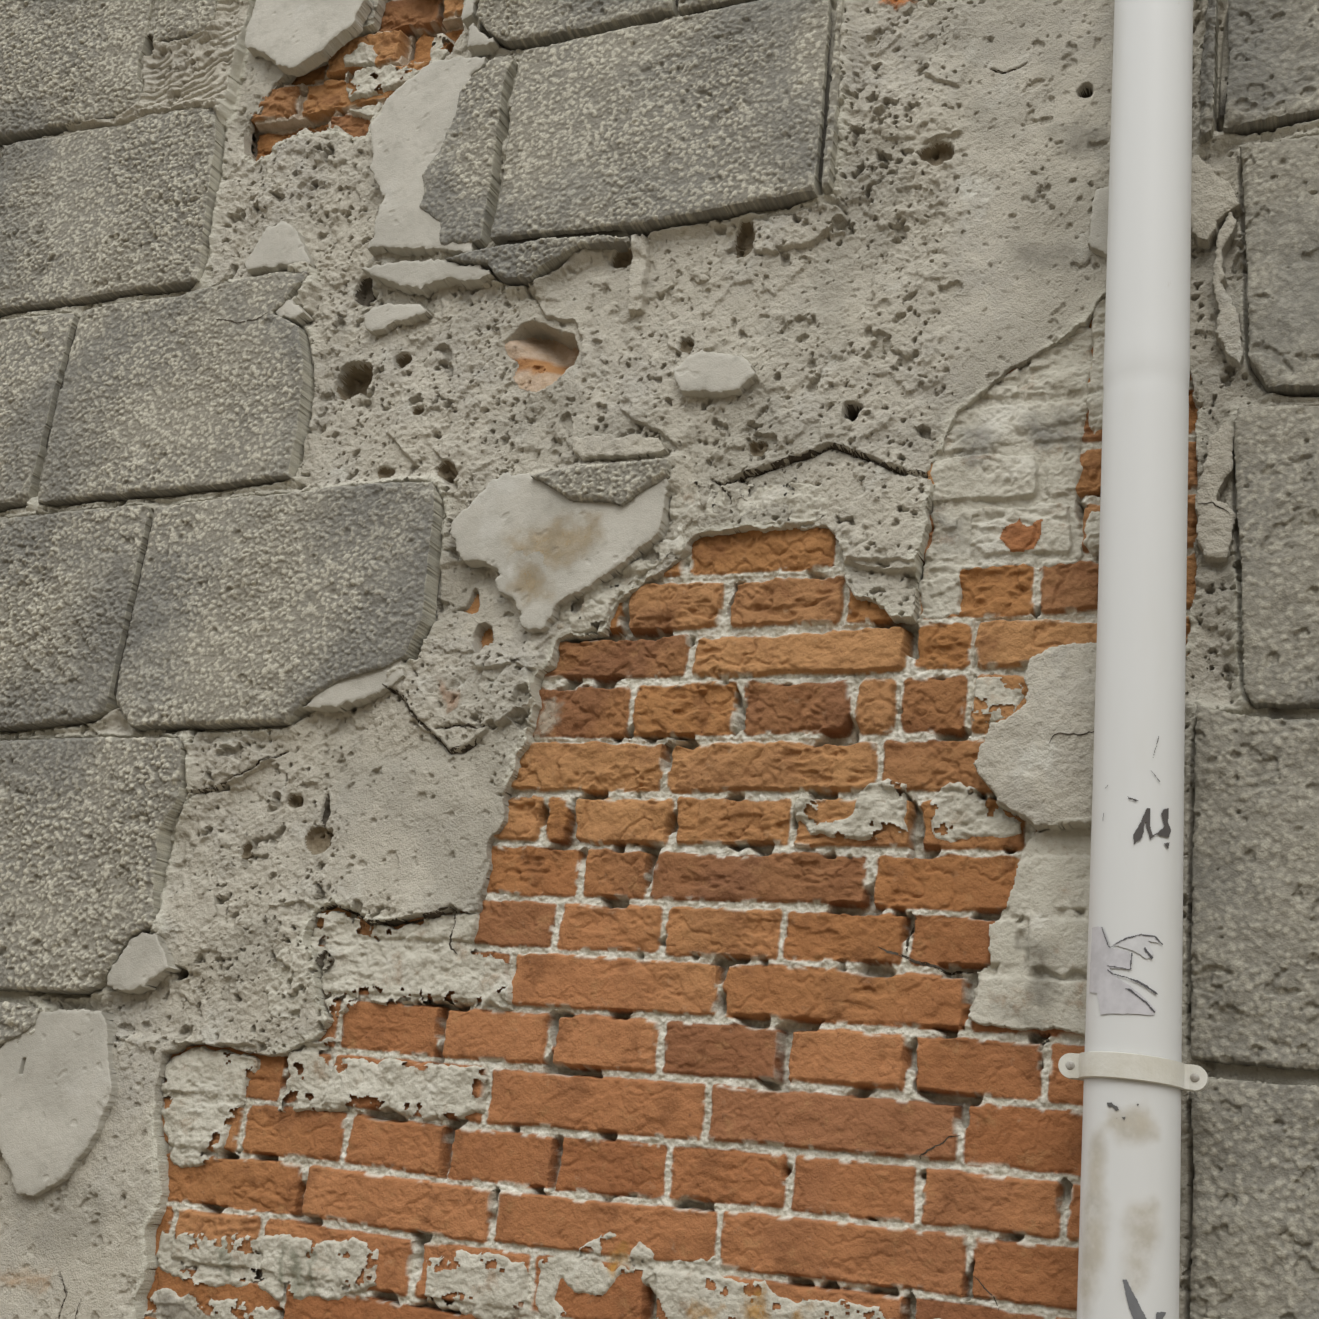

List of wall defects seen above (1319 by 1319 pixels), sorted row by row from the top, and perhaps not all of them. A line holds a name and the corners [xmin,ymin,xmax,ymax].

peeling [245,0,529,257]
crack [712,443,930,499]
peeling [450,472,672,634]
spalling [1000,518,1043,552]
spalling [1182,0,1319,1087]
peeling [303,660,406,715]
peeling [165,890,221,966]
peeling [265,948,314,1019]
spalling [1179,1091,1224,1319]
peeling [156,1231,379,1301]
peeling [424,1249,530,1319]
peeling [535,1232,885,1319]